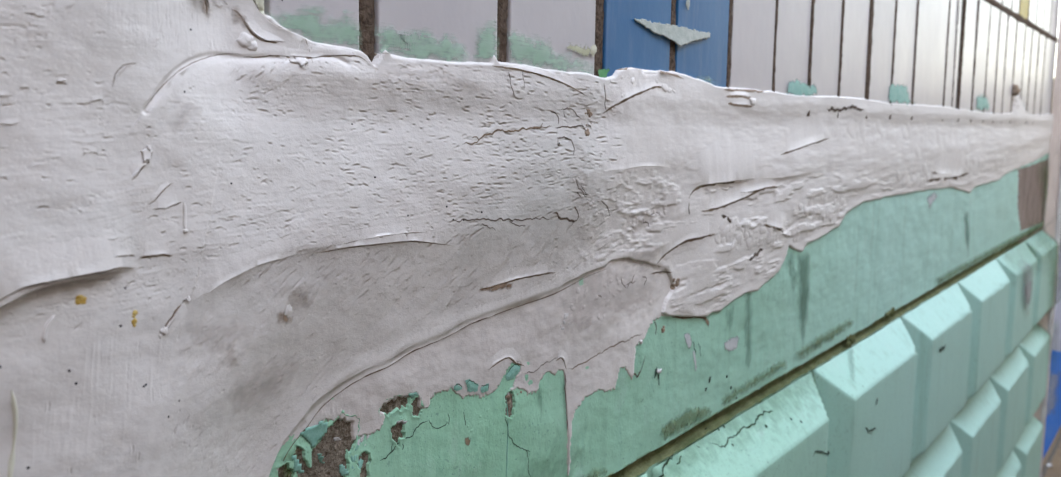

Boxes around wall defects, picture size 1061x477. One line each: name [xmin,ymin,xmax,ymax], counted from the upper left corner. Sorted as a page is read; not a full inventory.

crack [464,107,582,155]
flaking render [929,138,970,182]
flaking render [312,220,453,253]
flaking render [628,140,790,274]
peeling [1017,159,1048,243]
flaking render [672,303,706,319]
flaking render [277,257,608,477]
crack [659,410,772,477]